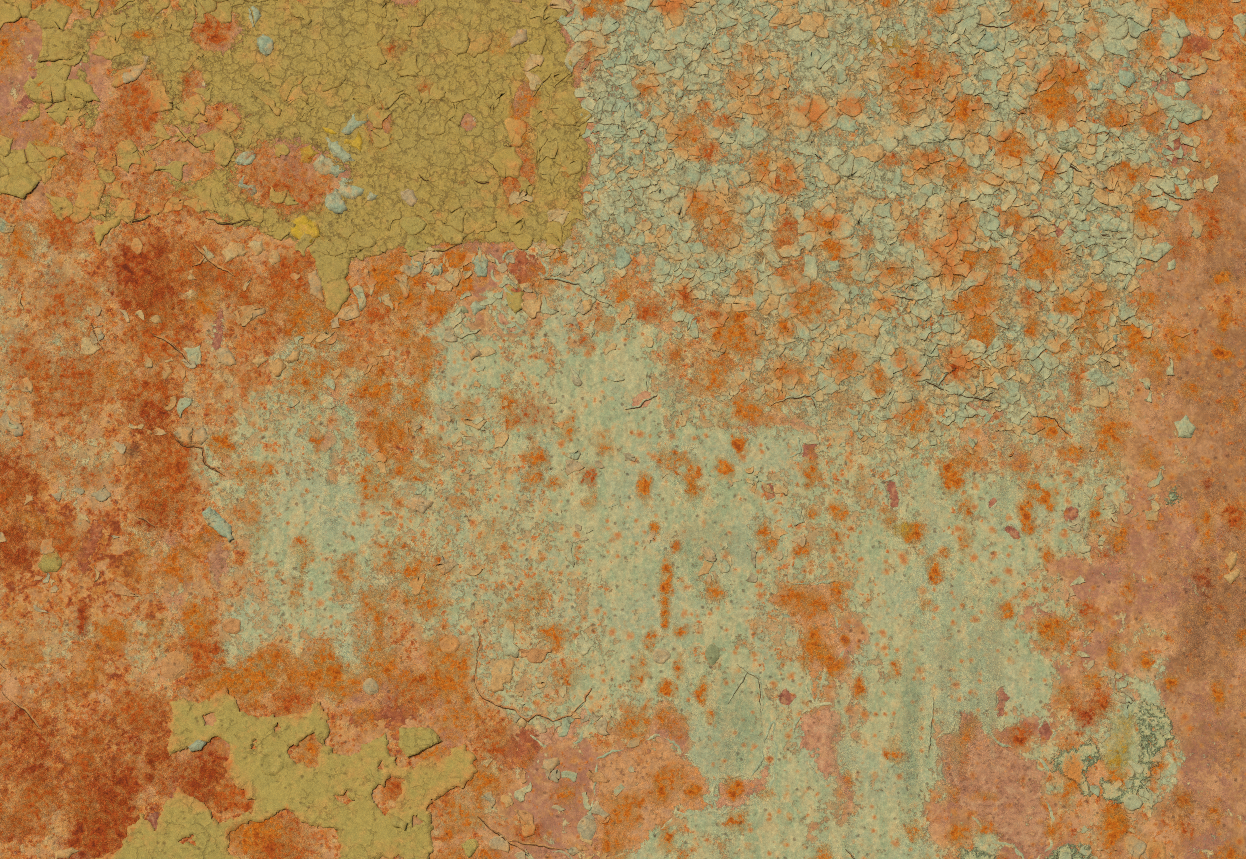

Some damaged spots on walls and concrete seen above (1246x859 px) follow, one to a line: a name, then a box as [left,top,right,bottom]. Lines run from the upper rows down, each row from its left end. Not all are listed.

peeling [128,396,208,445]
rust [0,239,362,583]
peeling [144,280,266,380]
crack [0,0,614,308]
rust [713,394,780,475]
peeling [252,0,1246,509]
rust [693,281,821,391]
rust [179,585,505,859]
peeling [95,620,778,859]
rust [634,540,686,688]
rust [780,581,850,677]
peeling [934,623,1175,859]